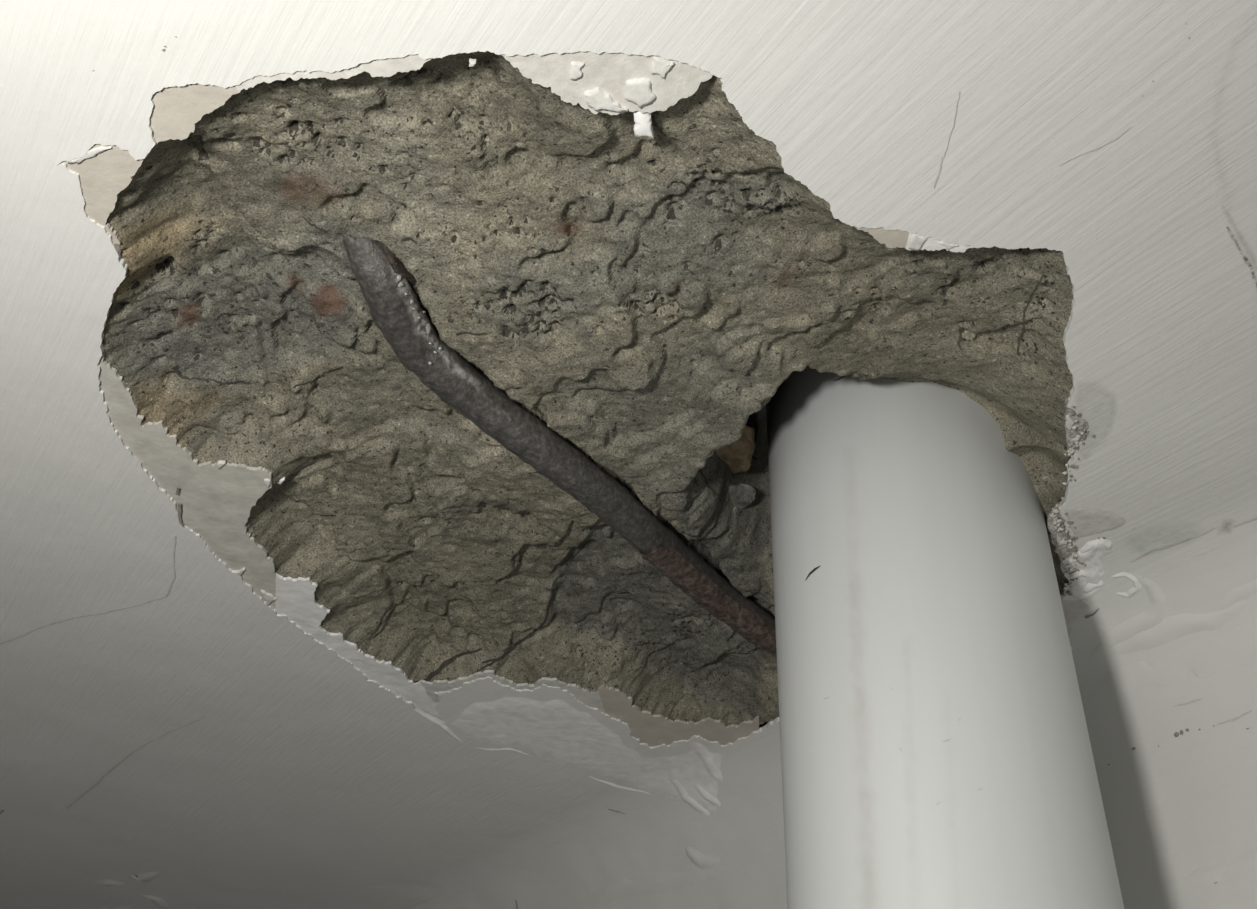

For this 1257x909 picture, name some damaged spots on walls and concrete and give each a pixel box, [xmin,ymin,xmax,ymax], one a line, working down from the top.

spalling [62,51,1096,747]
crack [0,488,184,645]
crack [1132,518,1257,562]